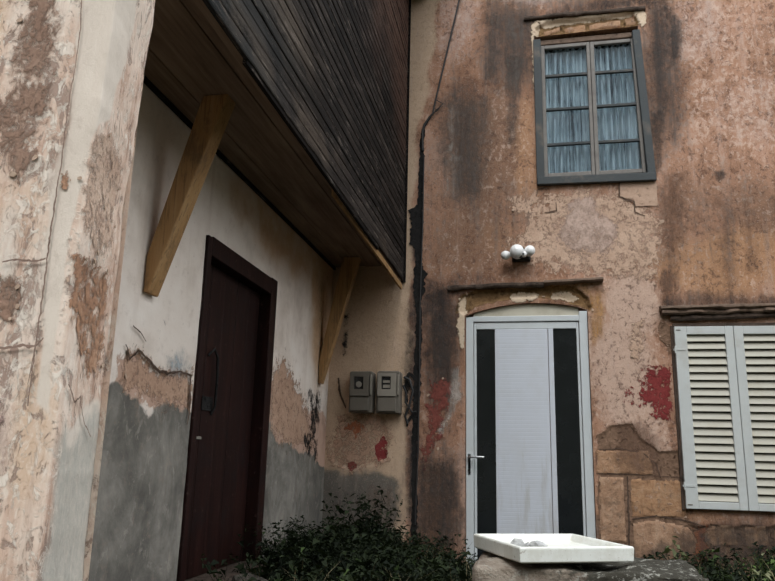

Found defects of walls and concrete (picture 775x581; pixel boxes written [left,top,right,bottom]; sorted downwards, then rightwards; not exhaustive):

flaking render [0,0,59,184]
spalling [531,11,647,88]
leakage [553,0,680,92]
flaking render [59,133,123,379]
flaking render [505,183,669,285]
crack [618,183,647,216]
spalling [455,285,594,349]
flaking render [119,346,194,413]
flaking render [270,356,313,453]
peeling [375,436,388,460]
peeling [617,318,674,425]
spalling [595,421,775,573]